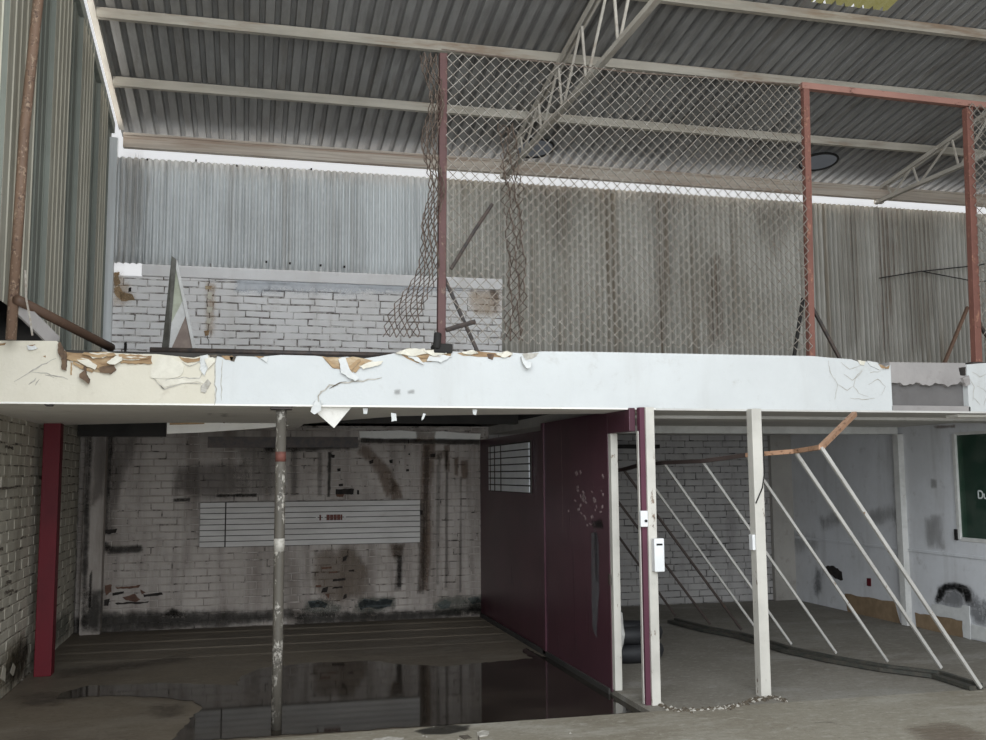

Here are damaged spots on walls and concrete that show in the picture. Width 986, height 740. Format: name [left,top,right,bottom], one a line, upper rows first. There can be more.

spalling [58,342,236,393]
spalling [322,356,383,381]
spalling [959,367,971,387]
peeling [310,400,323,415]
water stain [55,437,481,644]
water stain [935,583,986,622]
water stain [0,638,28,690]